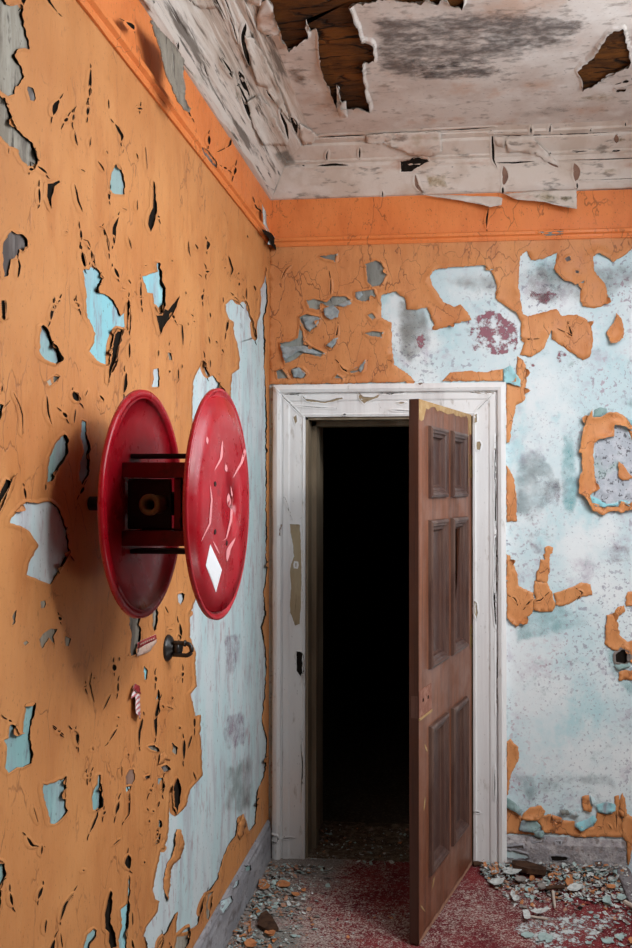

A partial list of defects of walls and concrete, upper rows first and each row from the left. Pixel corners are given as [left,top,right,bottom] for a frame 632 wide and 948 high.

peeling [0,0,40,173]
spalling [244,0,468,146]
leakage [377,16,580,78]
spalling [574,23,632,94]
peeling [106,163,127,197]
peeling [0,228,30,279]
peeling [34,322,64,388]
peeling [78,262,132,372]
peeling [0,474,72,610]
peeling [115,205,632,948]
peeling [0,699,37,776]
peeling [38,772,71,827]